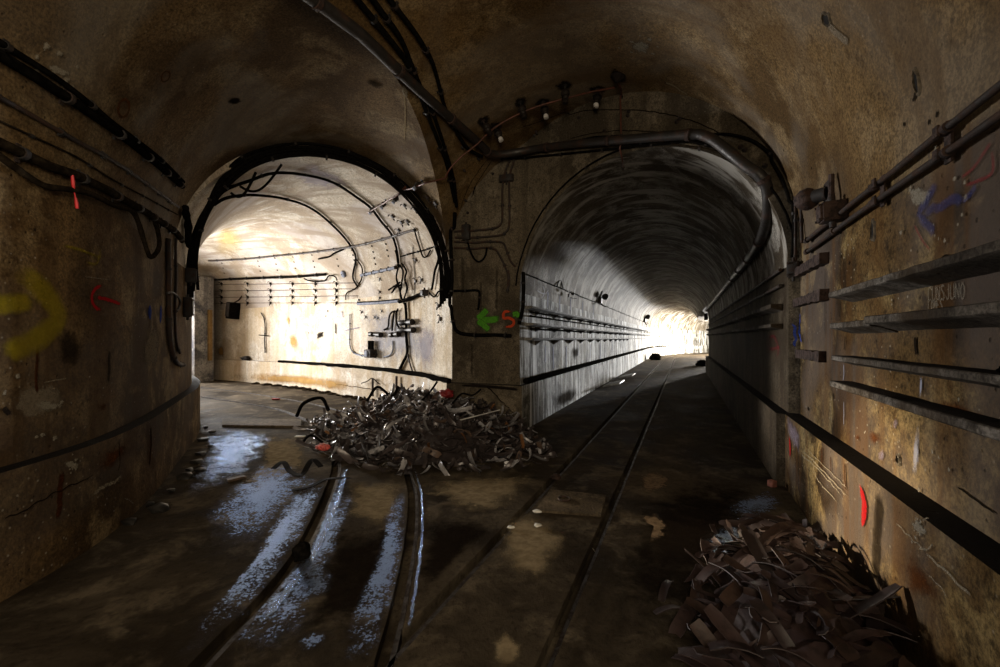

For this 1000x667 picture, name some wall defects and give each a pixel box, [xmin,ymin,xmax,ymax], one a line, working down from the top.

leakage [316,529,393,620]